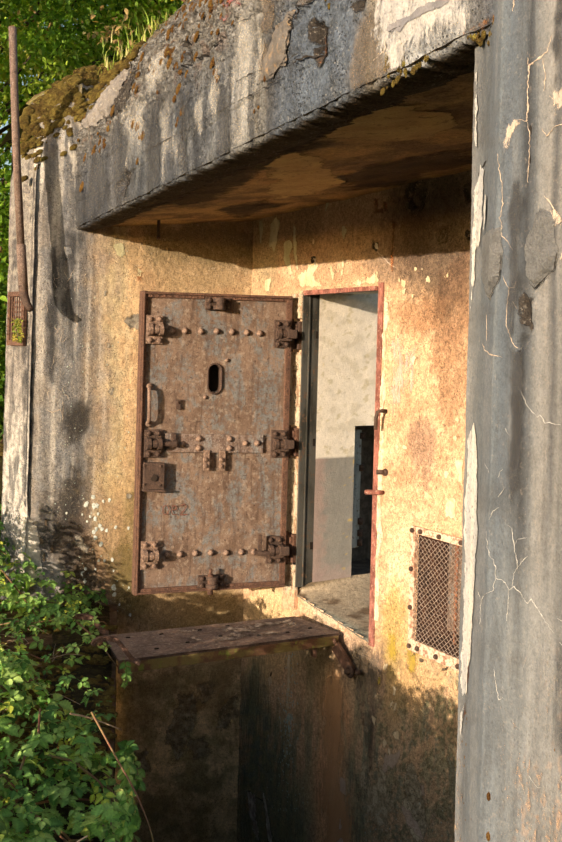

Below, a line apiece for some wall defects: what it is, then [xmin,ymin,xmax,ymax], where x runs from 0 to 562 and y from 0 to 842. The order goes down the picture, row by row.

peeling [259,1,299,81]
spalling [307,16,329,68]
damp [82,123,130,218]
damp [145,105,160,188]
damp [214,89,229,153]
damp [160,129,337,218]
damp [335,151,472,191]
crack [482,35,562,357]
damp [46,231,81,381]
spalling [518,292,534,330]
crack [478,463,562,645]